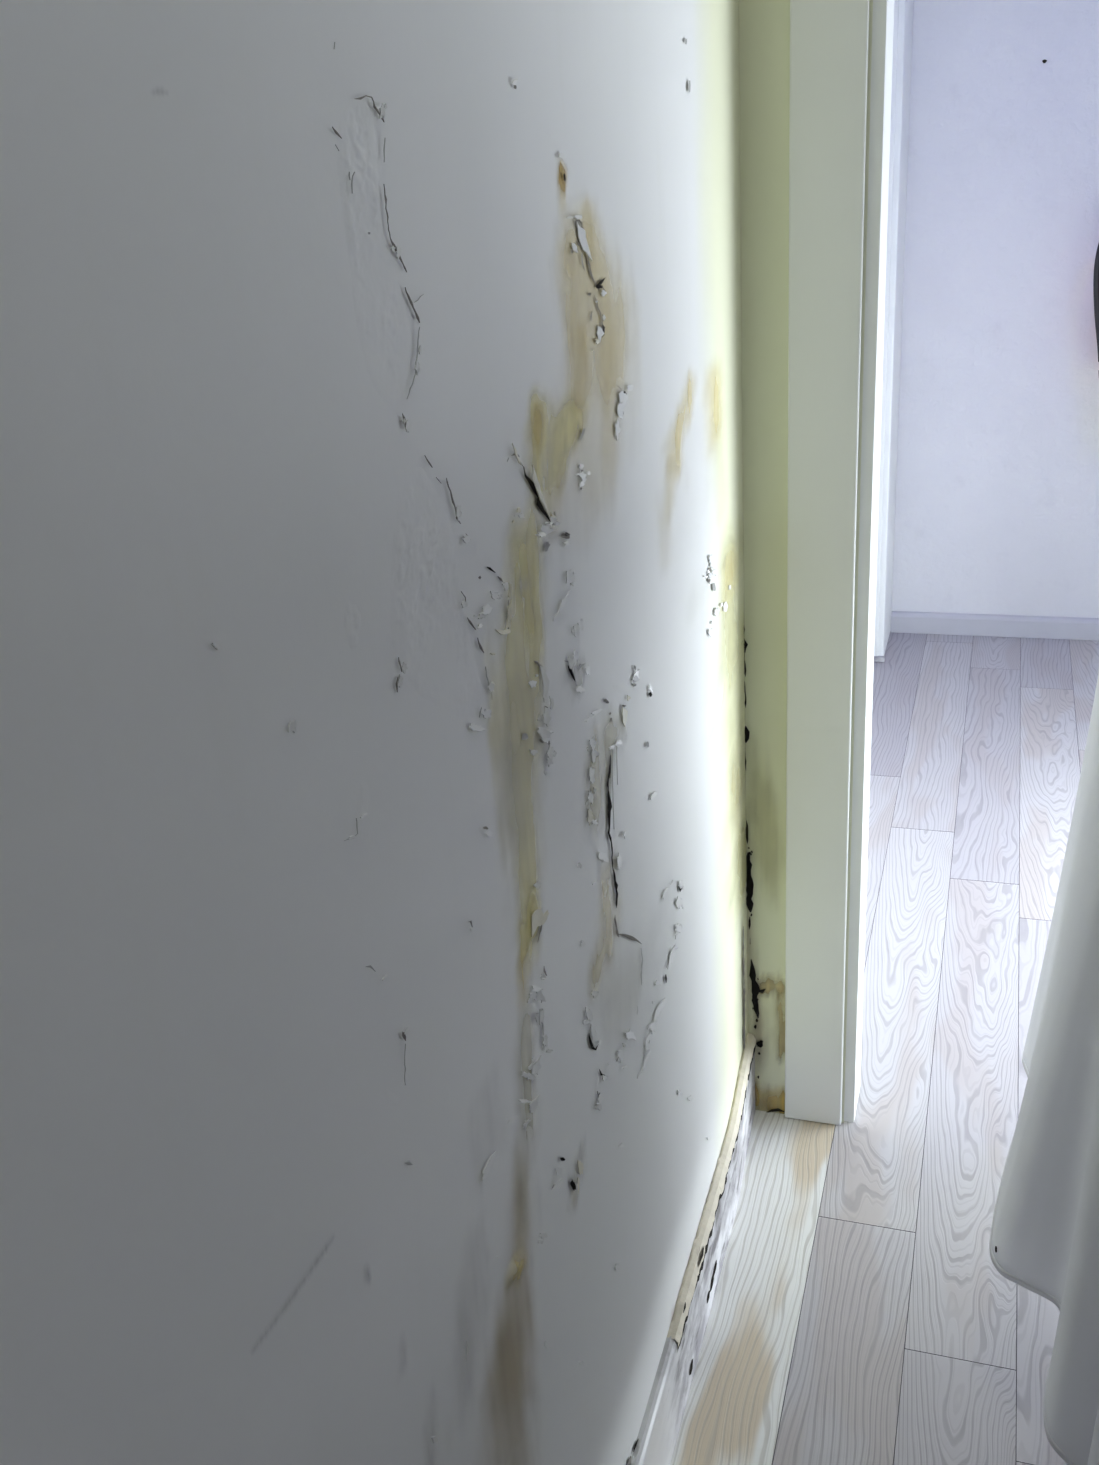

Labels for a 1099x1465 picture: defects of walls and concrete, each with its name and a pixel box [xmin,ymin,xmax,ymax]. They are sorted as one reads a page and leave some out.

leakage [532,252,615,484]
crack [507,443,561,552]
peeling [522,661,557,776]
peeling [632,665,653,697]
leakage [727,562,748,708]
crack [584,695,643,1014]
leakage [739,820,754,929]
peeling [583,880,684,1111]
crack [740,926,748,1049]
leakage [749,959,785,1058]
leakage [755,1076,785,1114]